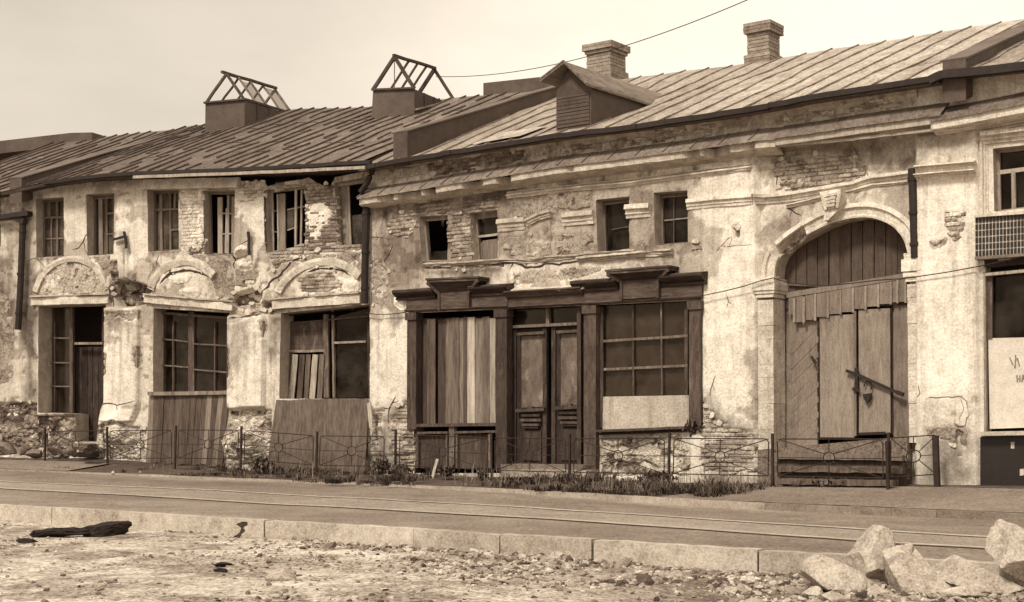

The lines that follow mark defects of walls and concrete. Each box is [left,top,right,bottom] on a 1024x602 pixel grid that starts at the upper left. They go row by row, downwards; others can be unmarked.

flaking render [773,150,866,191]
flaking render [36,255,140,321]
crack [147,258,207,284]
flaking render [178,189,276,338]
crack [232,190,351,293]
flaking render [238,179,391,306]
flaking render [387,190,601,285]
flaking render [929,210,966,249]
flaking render [601,402,758,477]
crack [916,384,972,434]